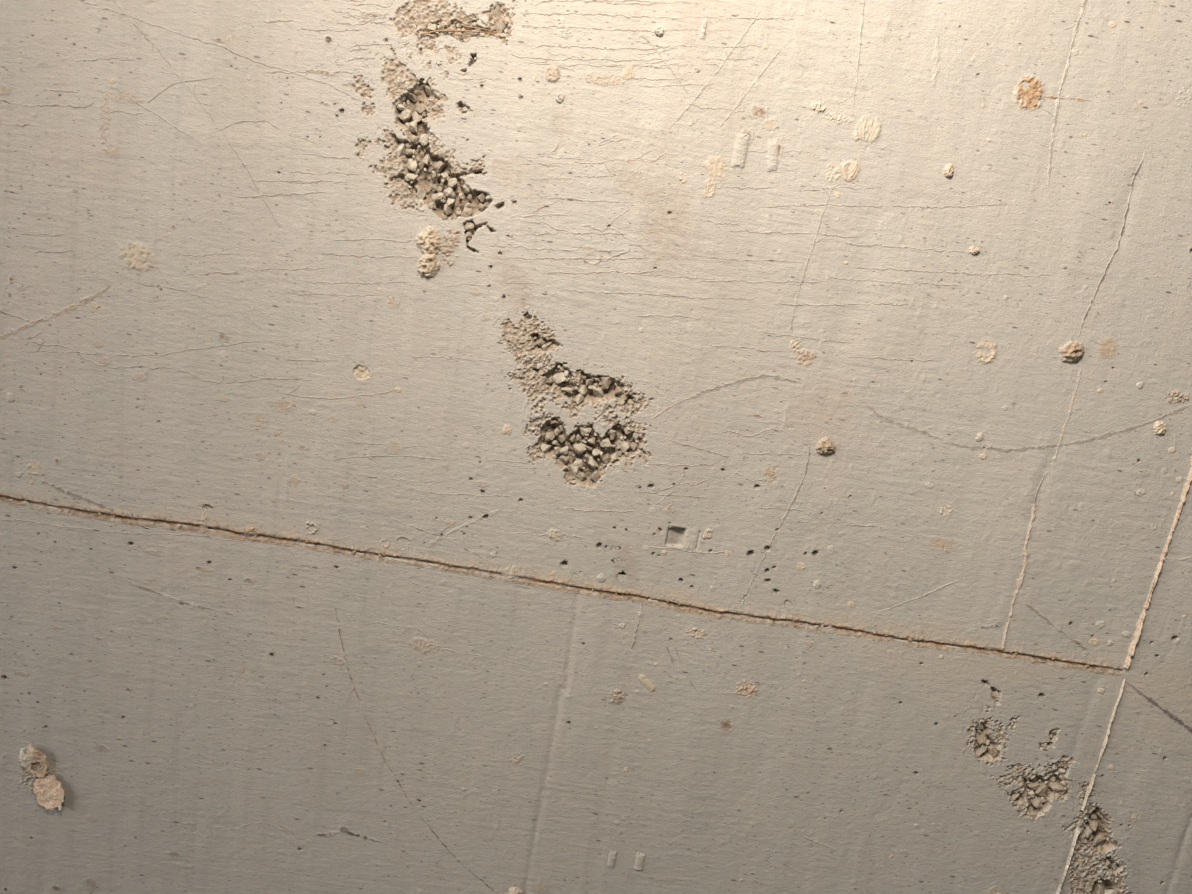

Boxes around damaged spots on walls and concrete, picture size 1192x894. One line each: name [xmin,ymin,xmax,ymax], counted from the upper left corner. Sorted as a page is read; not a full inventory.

crack [0,0,392,227]
crack [458,0,792,113]
crack [839,0,865,105]
crack [1040,0,1090,185]
crack [0,311,393,400]
crack [139,238,416,298]
crack [333,441,511,497]
crack [512,400,878,608]
crack [449,133,1047,362]
crack [1034,369,1081,503]
crack [1078,152,1146,336]
crack [322,607,508,894]